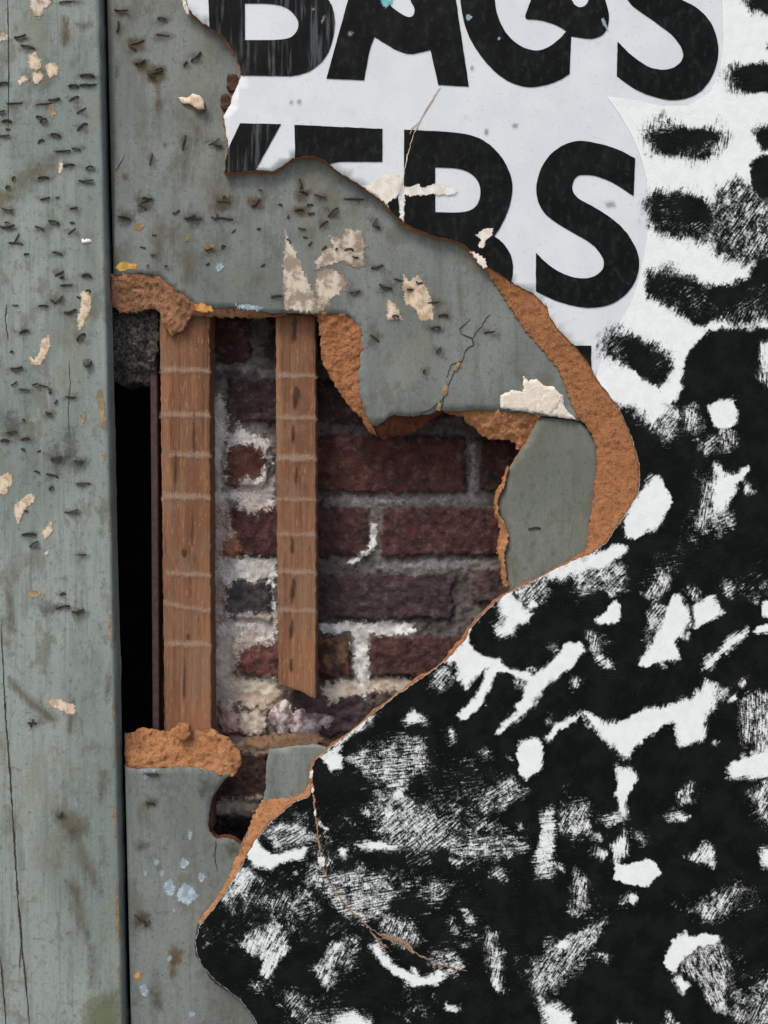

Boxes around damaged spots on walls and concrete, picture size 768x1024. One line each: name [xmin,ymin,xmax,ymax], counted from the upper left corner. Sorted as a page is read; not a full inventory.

peeling [17,52,59,85]
peeling [178,94,205,112]
peeling [282,228,367,314]
peeling [77,290,92,330]
peeling [386,274,434,321]
peeling [29,334,51,366]
crack [420,316,488,415]
peeling [500,376,576,420]
water stain [319,444,487,508]
water stain [165,393,314,737]
water stain [348,522,496,572]
water stain [319,619,417,706]